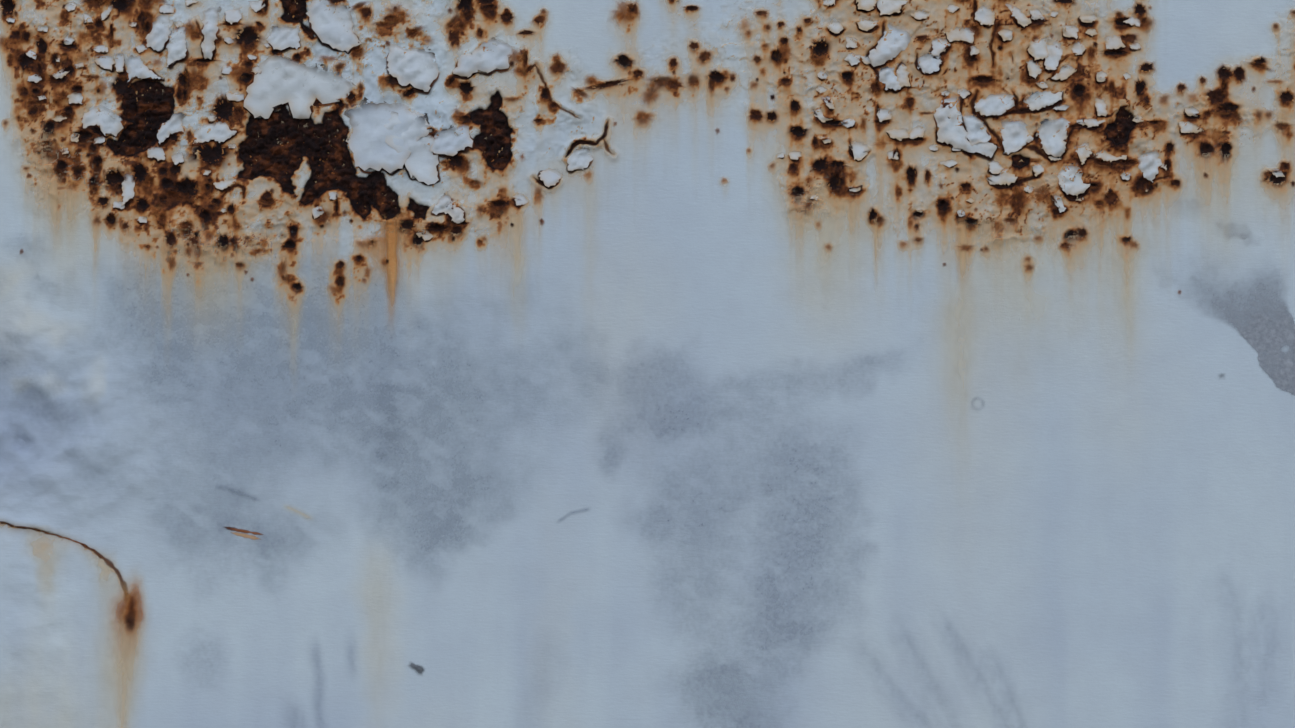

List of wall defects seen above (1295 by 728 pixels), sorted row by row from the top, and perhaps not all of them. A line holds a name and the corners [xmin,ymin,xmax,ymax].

rust [0,0,1295,309]
peeling [1213,283,1295,395]
crack [0,521,143,655]